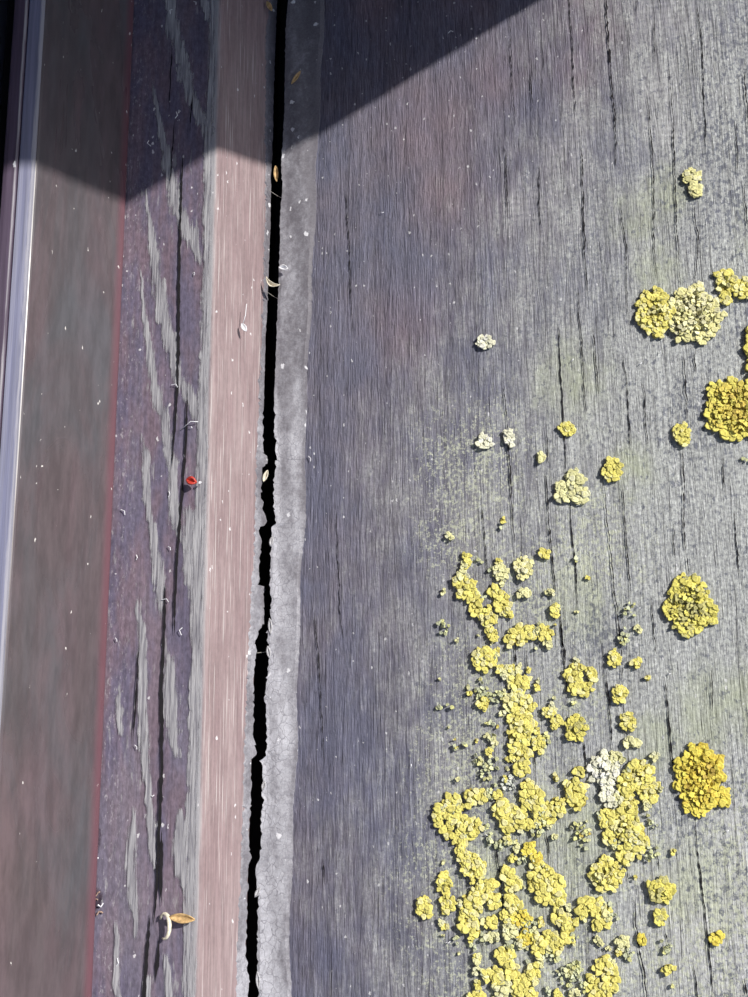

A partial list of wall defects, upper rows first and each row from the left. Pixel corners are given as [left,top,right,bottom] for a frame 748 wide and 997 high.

crack [133,54,193,997]
crack [261,0,288,836]